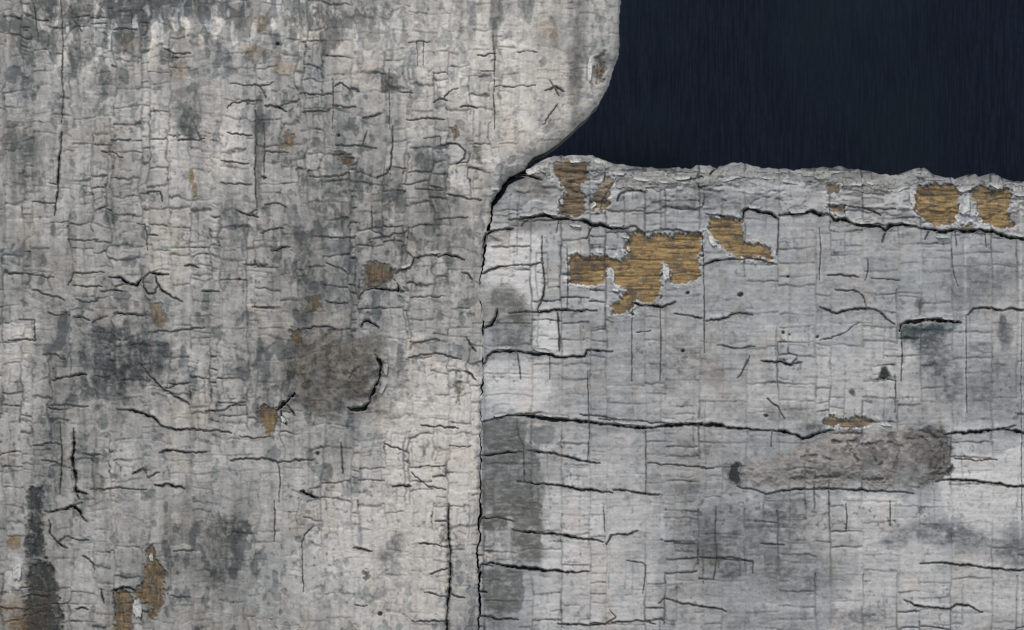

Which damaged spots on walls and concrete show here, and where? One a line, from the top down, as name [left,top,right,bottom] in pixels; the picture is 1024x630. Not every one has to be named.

crack [31,0,82,216]
peeling [526,158,1024,230]
crack [178,43,1024,545]
peeling [568,217,773,315]
crack [9,223,318,614]
peeling [822,415,891,429]
peeling [114,546,165,630]
crack [385,444,589,630]
damp [481,420,542,610]
crack [558,561,726,626]
crack [904,600,983,613]
crack [920,562,1024,572]